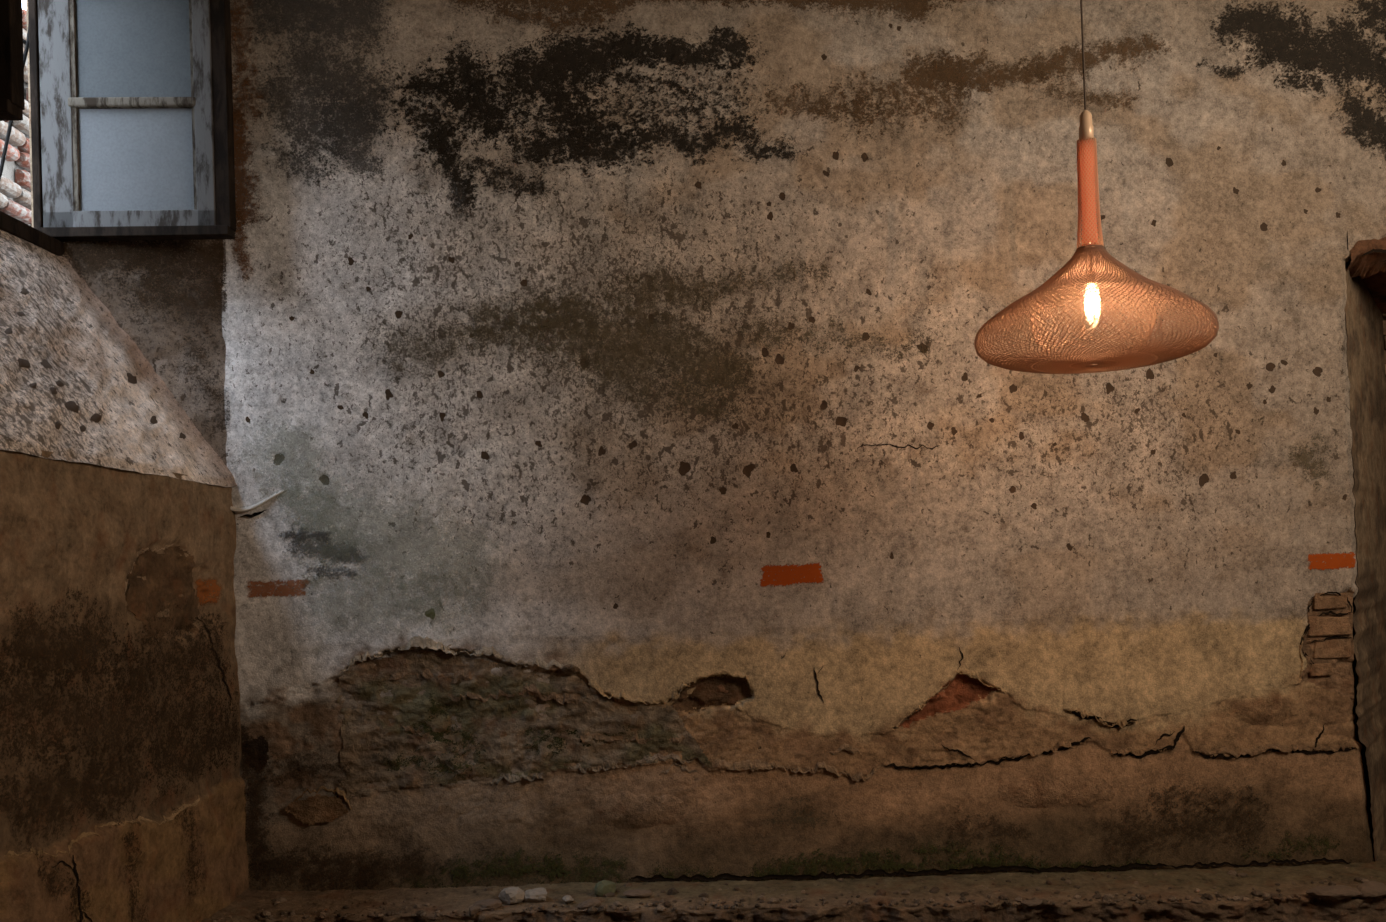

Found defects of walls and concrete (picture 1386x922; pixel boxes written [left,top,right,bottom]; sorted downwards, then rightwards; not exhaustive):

damp [239,0,1172,233]
damp [1196,0,1386,161]
damp [366,257,953,422]
damp [0,584,450,922]
spalling [337,636,754,800]
spalling [892,646,1006,731]
spalling [1298,587,1355,699]